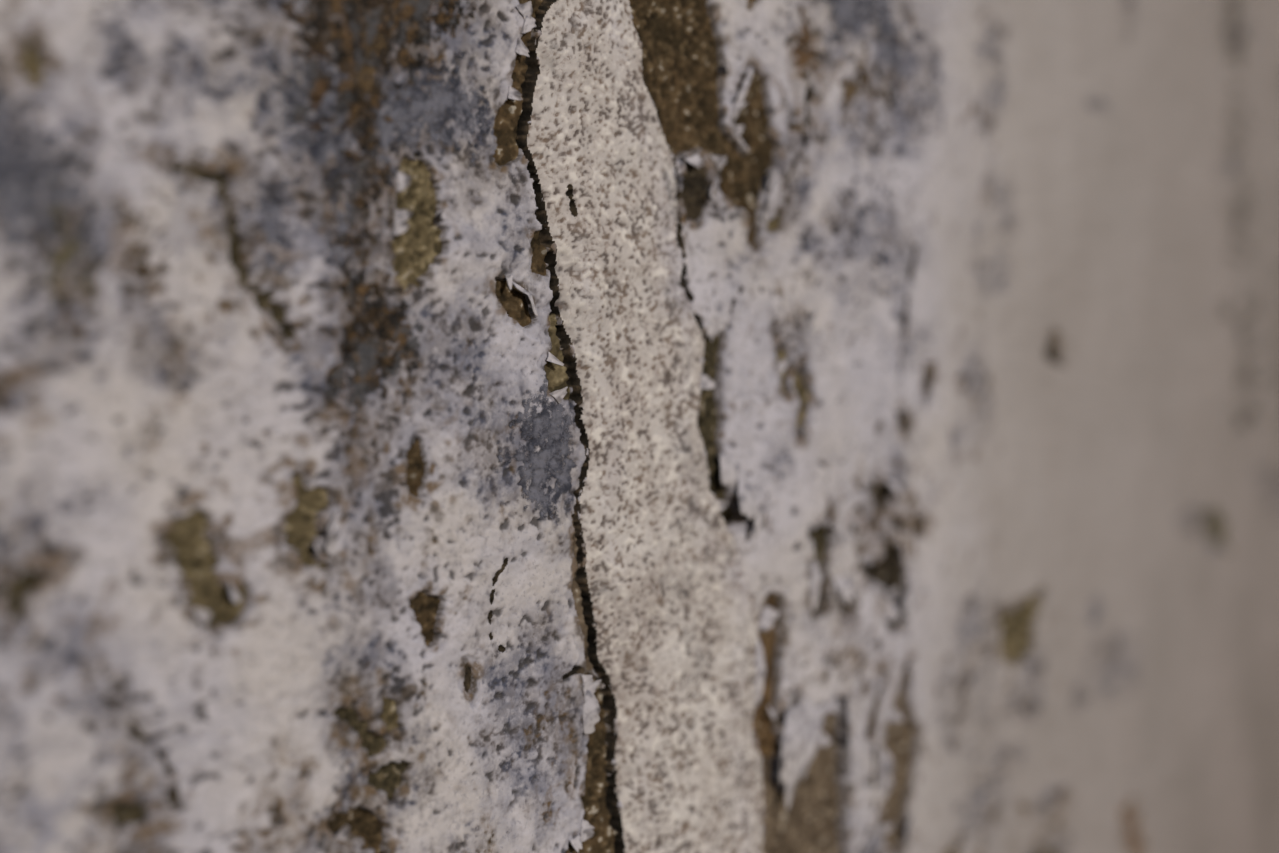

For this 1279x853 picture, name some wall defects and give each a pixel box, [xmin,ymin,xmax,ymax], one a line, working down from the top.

spalling [323,154,446,415]
crack [516,0,626,853]
crack [659,127,744,340]
peeling [629,0,780,250]
peeling [697,295,766,538]
peeling [774,350,809,437]
spalling [840,38,870,109]
peeling [157,507,250,628]
peeling [565,515,616,853]
peeling [752,595,915,853]
peeling [809,479,922,629]
spalling [997,588,1040,667]